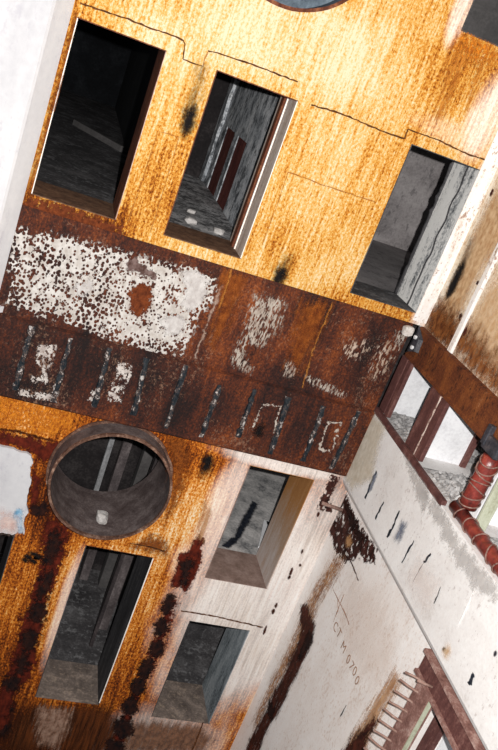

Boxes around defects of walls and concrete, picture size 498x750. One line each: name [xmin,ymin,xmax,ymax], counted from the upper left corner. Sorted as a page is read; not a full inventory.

crack [80,2,298,82]
rust [434,33,498,122]
crack [311,104,485,160]
peeling [6,226,223,359]
rust [126,257,157,317]
peeling [232,293,285,373]
rust [287,301,332,388]
rust [425,189,498,396]
rust [0,398,211,750]
rust [246,556,345,750]
rust [341,673,401,750]